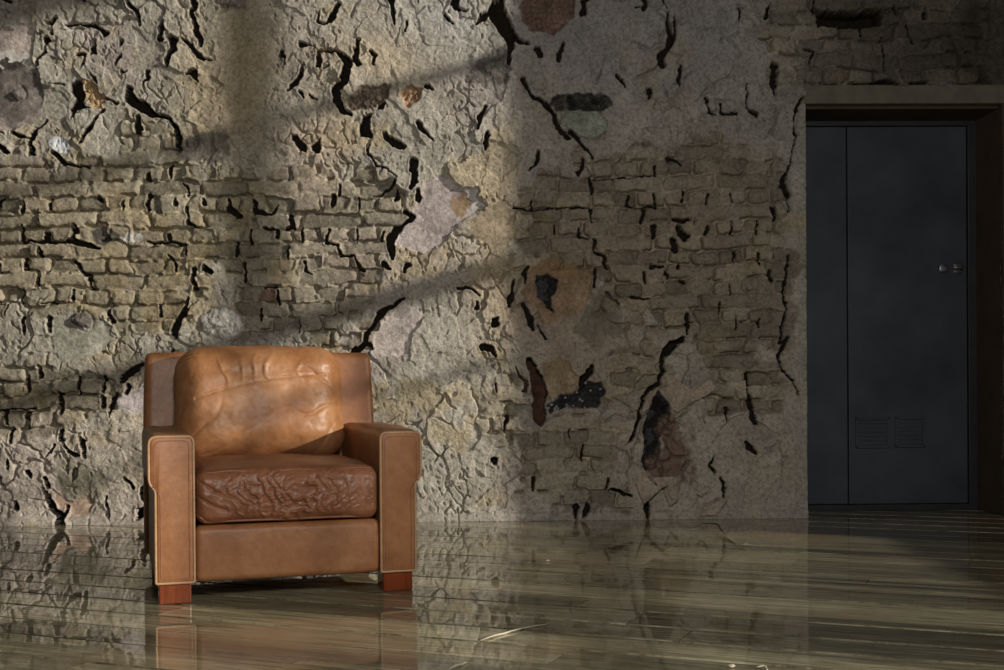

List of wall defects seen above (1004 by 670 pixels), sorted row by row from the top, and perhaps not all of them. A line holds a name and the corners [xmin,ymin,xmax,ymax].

spalling [0,23,44,129]
crack [0,0,434,353]
spalling [395,176,517,253]
crack [442,0,803,395]
spalling [51,311,114,363]
spalling [372,303,421,357]
crack [456,267,548,426]
spalling [535,274,558,312]
spalling [542,358,605,413]
crack [628,313,690,443]
crack [0,362,144,525]
crack [572,477,650,519]